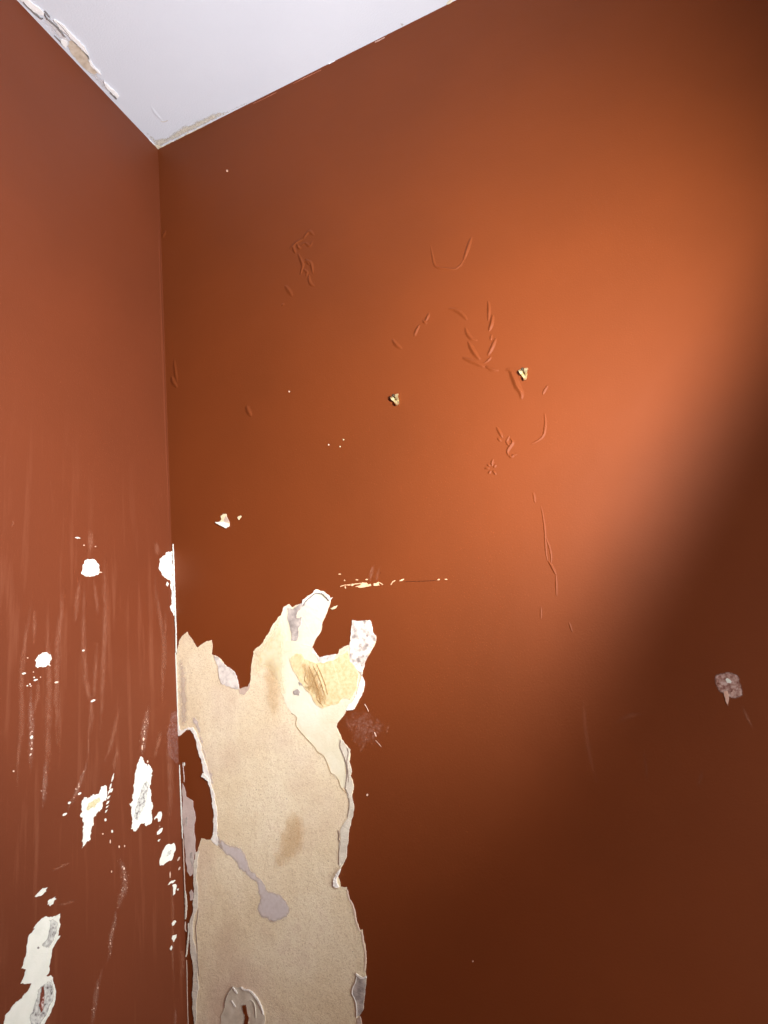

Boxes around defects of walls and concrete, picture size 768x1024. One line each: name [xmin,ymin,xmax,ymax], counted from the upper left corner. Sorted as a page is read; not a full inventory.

peeling [20,0,119,100]
peeling [75,537,102,577]
peeling [159,551,174,616]
peeling [215,514,241,528]
peeling [62,774,125,848]
peeling [130,589,376,1024]
peeling [4,887,60,1024]